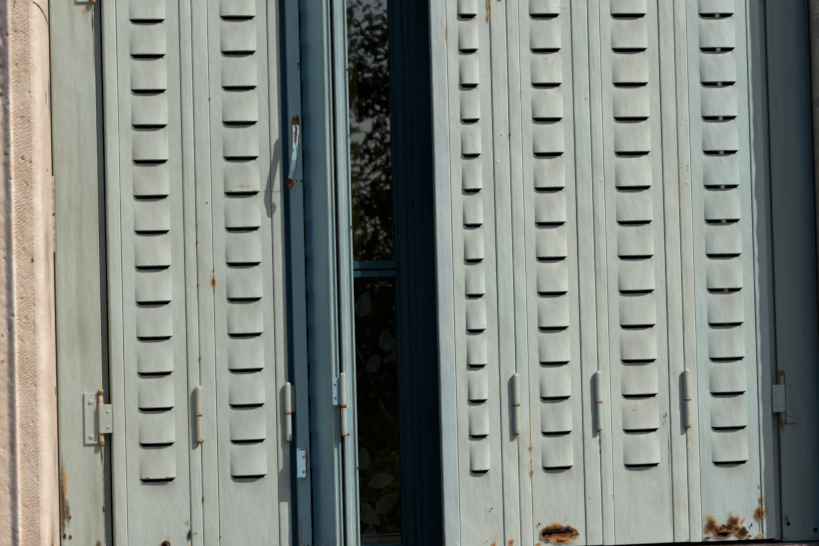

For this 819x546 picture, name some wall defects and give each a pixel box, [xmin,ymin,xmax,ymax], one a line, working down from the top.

corrosion [60,466,72,545]
corrosion [703,483,766,540]